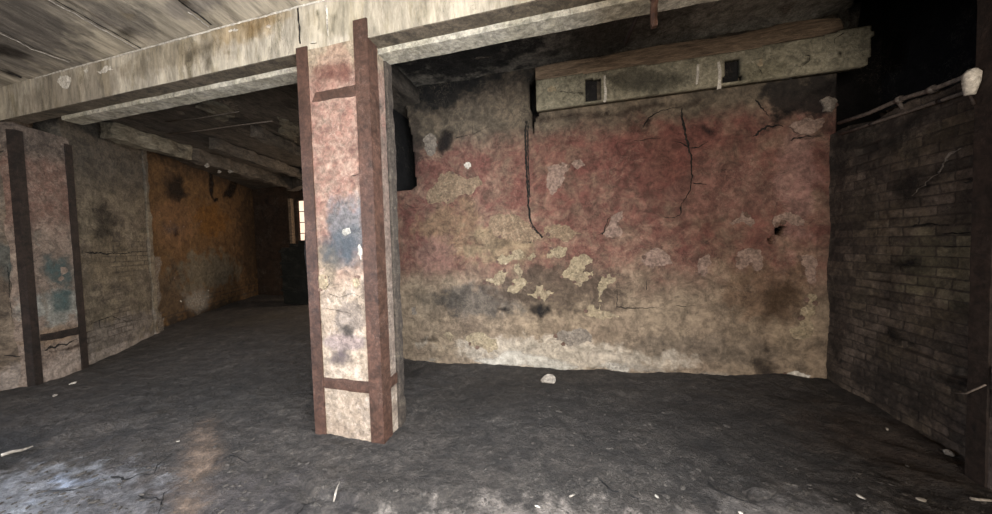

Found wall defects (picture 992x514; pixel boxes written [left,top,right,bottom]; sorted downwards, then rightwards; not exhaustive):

crack [178,0,212,27]
crack [524,121,543,242]
peeling [546,159,585,195]
crack [634,106,708,218]
peeling [483,211,655,320]
peeling [641,248,673,269]
peeling [735,248,764,271]
peeling [553,328,592,347]